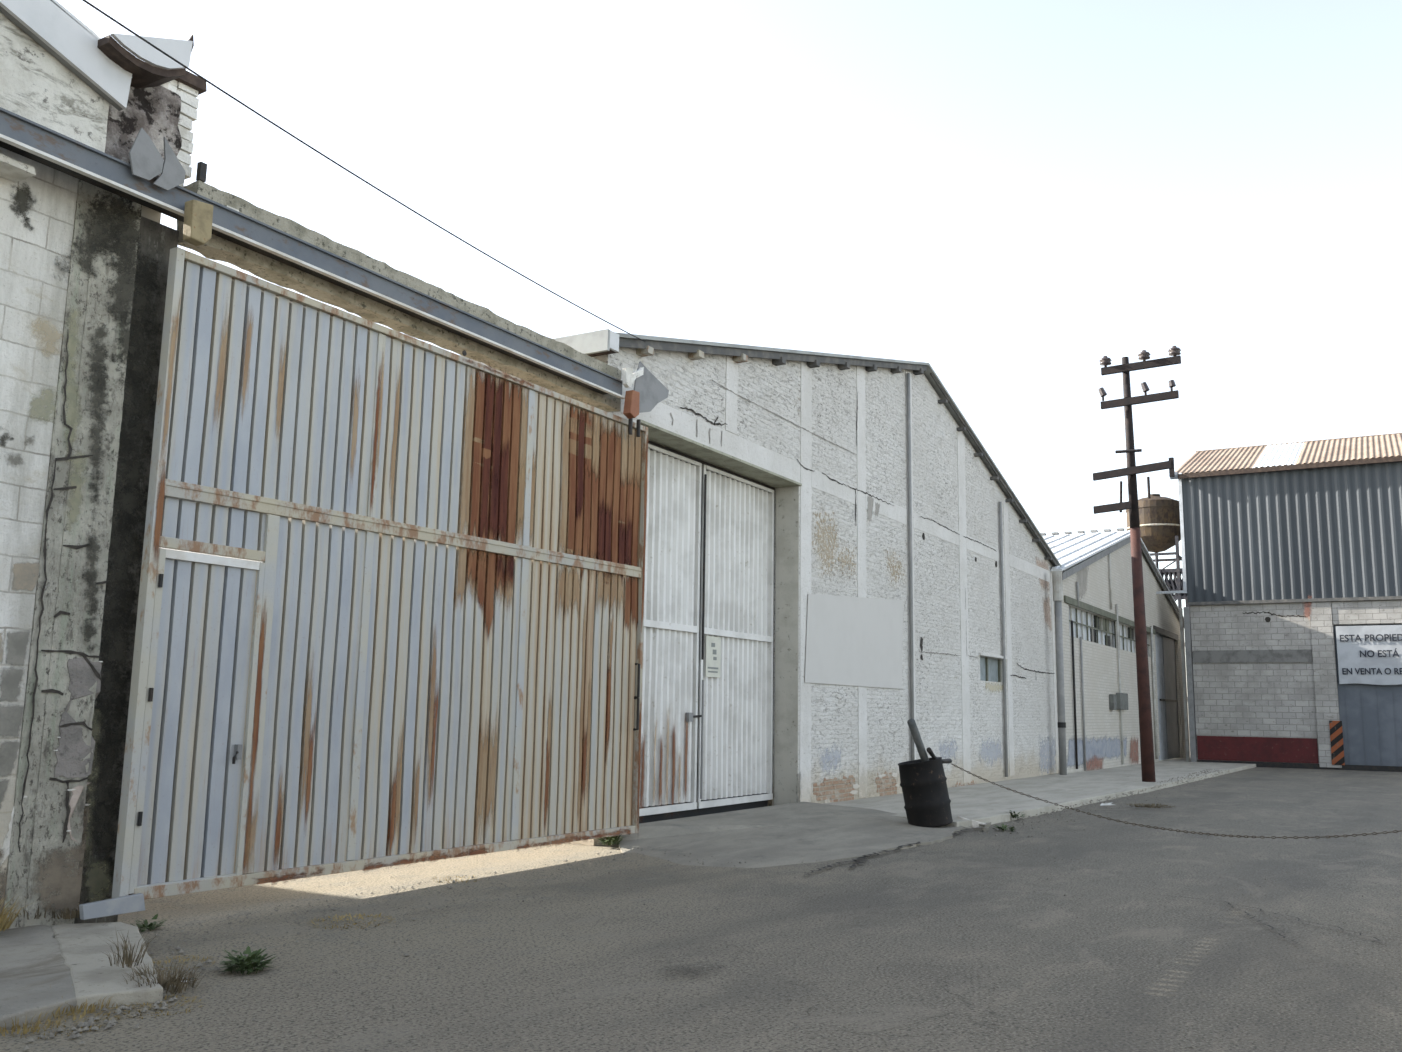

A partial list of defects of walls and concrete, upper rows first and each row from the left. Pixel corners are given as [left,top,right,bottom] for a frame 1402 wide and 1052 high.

leakage [10,185,36,230]
spalling [105,85,182,177]
leakage [12,563,39,591]
crack [18,332,101,852]
leakage [30,195,162,913]
corrosion [453,360,536,637]
corrosion [555,405,648,815]
spalling [53,657,103,846]
corrosion [243,612,322,884]
corrosion [517,703,688,851]